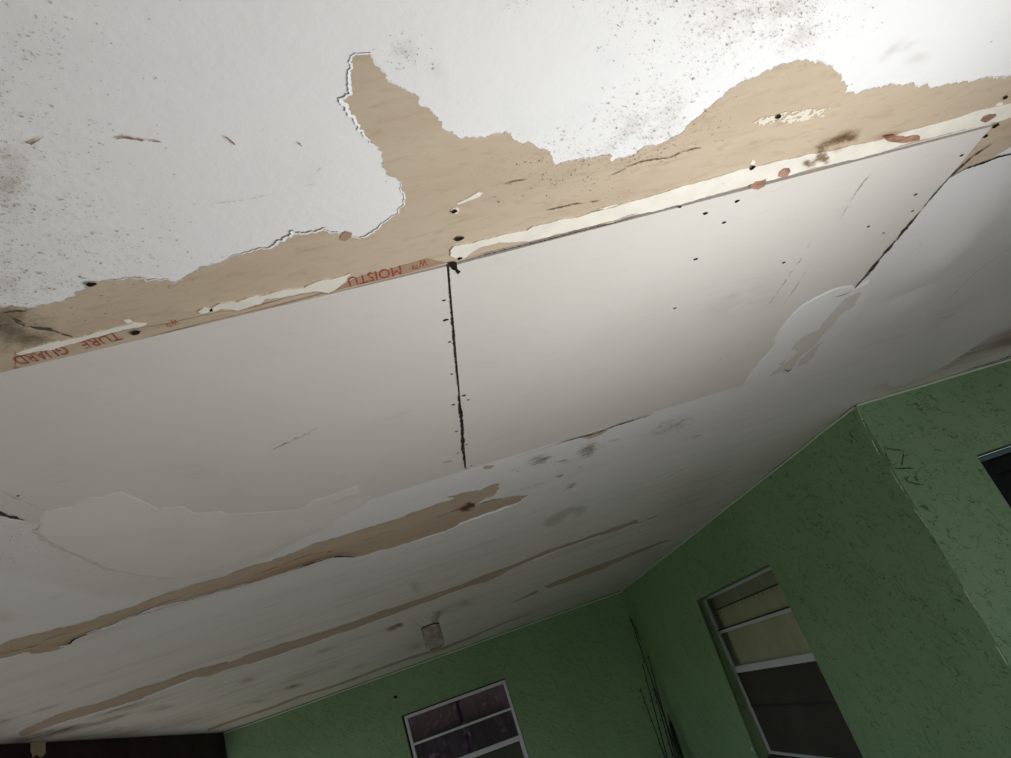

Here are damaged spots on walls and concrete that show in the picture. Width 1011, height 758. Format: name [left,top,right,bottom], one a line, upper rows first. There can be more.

damp [0,177,74,338]
peeling [0,53,1011,372]
peeling [0,483,527,660]
peeling [18,515,668,758]